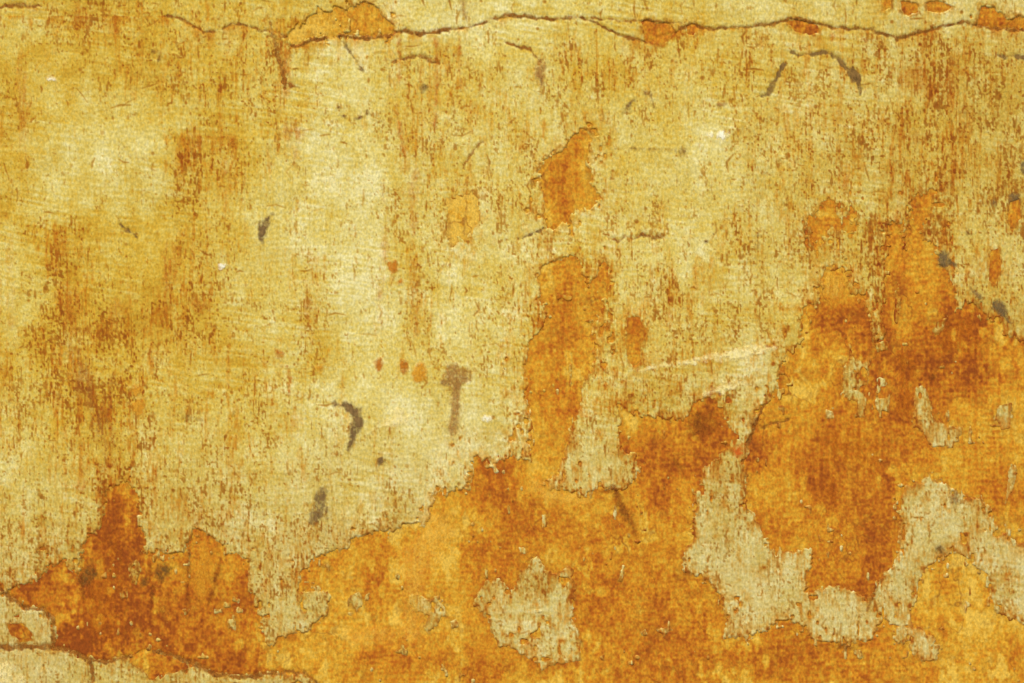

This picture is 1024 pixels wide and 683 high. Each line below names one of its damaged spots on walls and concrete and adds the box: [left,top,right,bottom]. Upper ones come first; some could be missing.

crack [166,13,1024,97]
peeling [526,123,610,236]
peeling [0,176,1024,683]